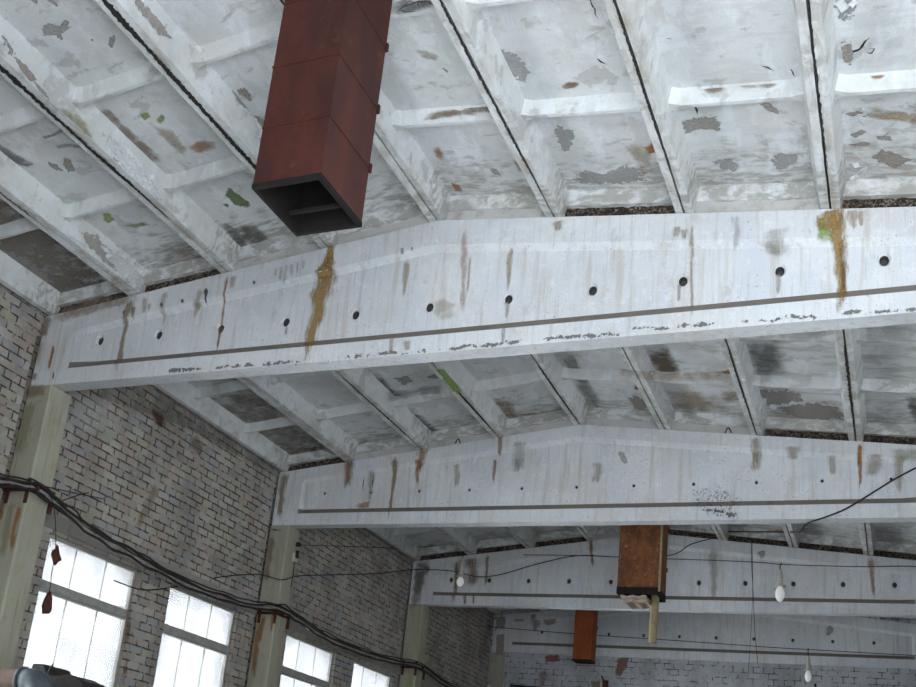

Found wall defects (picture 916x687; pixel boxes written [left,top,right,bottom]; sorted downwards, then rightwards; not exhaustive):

peeling [43,20,71,40]
peeling [833,0,858,21]
peeling [102,132,162,203]
peeling [555,125,575,151]
peeling [576,164,647,185]
peeling [841,108,912,168]
corrosion [817,209,846,304]
corrosion [305,246,336,350]
corrosion [115,301,135,364]